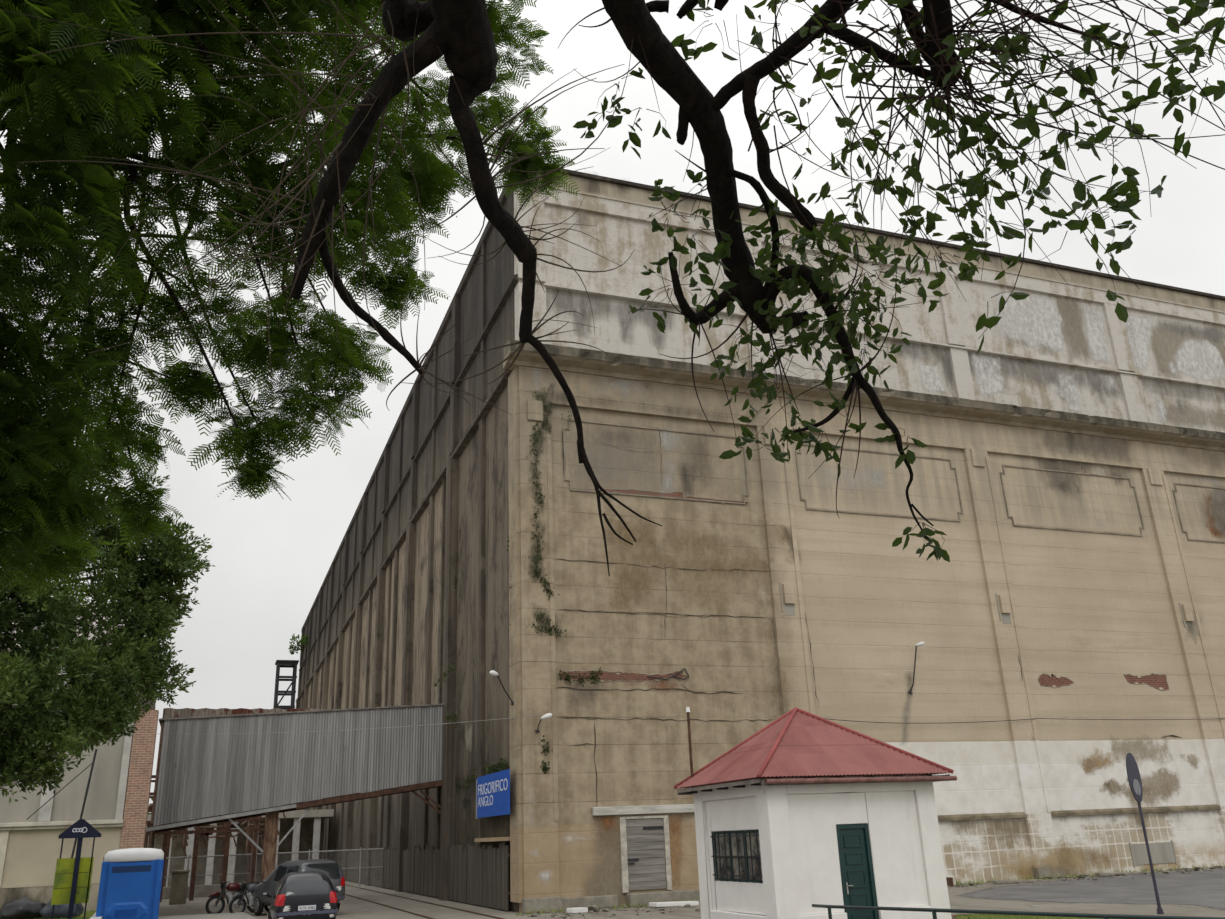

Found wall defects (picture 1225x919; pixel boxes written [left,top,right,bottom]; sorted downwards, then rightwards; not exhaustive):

leakage [554,293,671,344]
leakage [968,352,1116,394]
spalling [559,670,688,683]
spalling [1037,673,1074,688]
spalling [1123,673,1169,691]